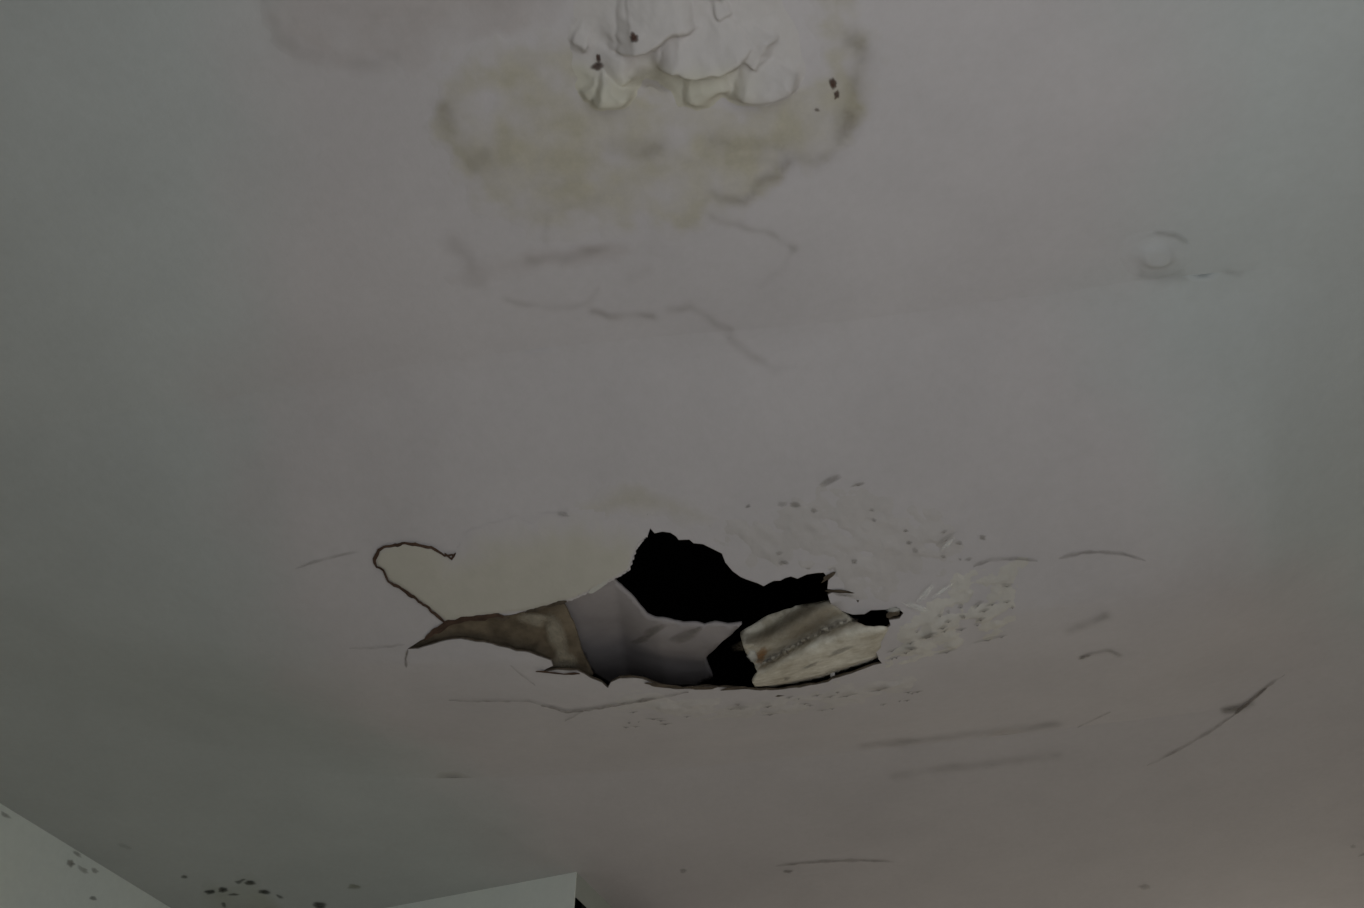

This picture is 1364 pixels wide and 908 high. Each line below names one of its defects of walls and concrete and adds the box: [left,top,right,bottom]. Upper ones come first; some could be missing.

water stain [260,0,893,292]
crack [373,542,456,660]
spalling [376,507,903,697]
crack [1226,688,1267,715]